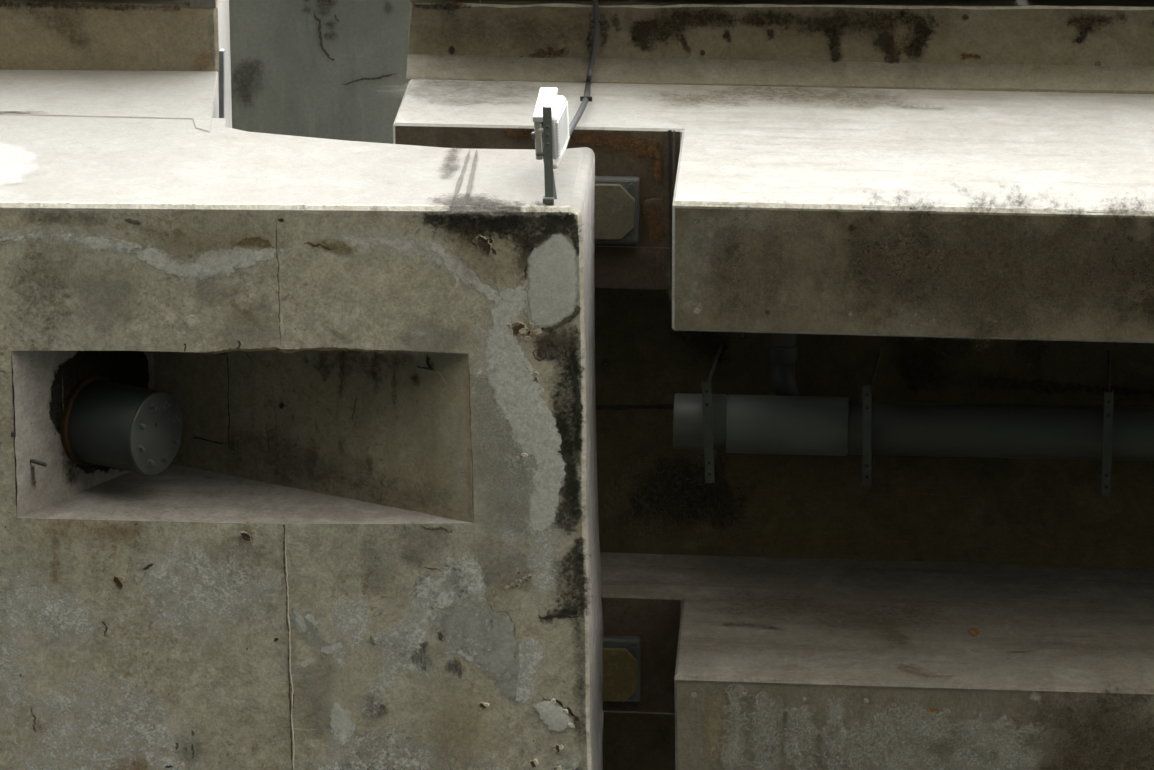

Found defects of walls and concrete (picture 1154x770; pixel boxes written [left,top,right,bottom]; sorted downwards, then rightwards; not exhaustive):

leakage [586,9,939,63]
leakage [1067,14,1126,40]
leakage [0,230,503,307]
spalling [471,235,496,256]
leakage [423,148,579,271]
leakage [472,329,588,619]
peeling [480,234,592,770]
leakage [723,688,1154,770]